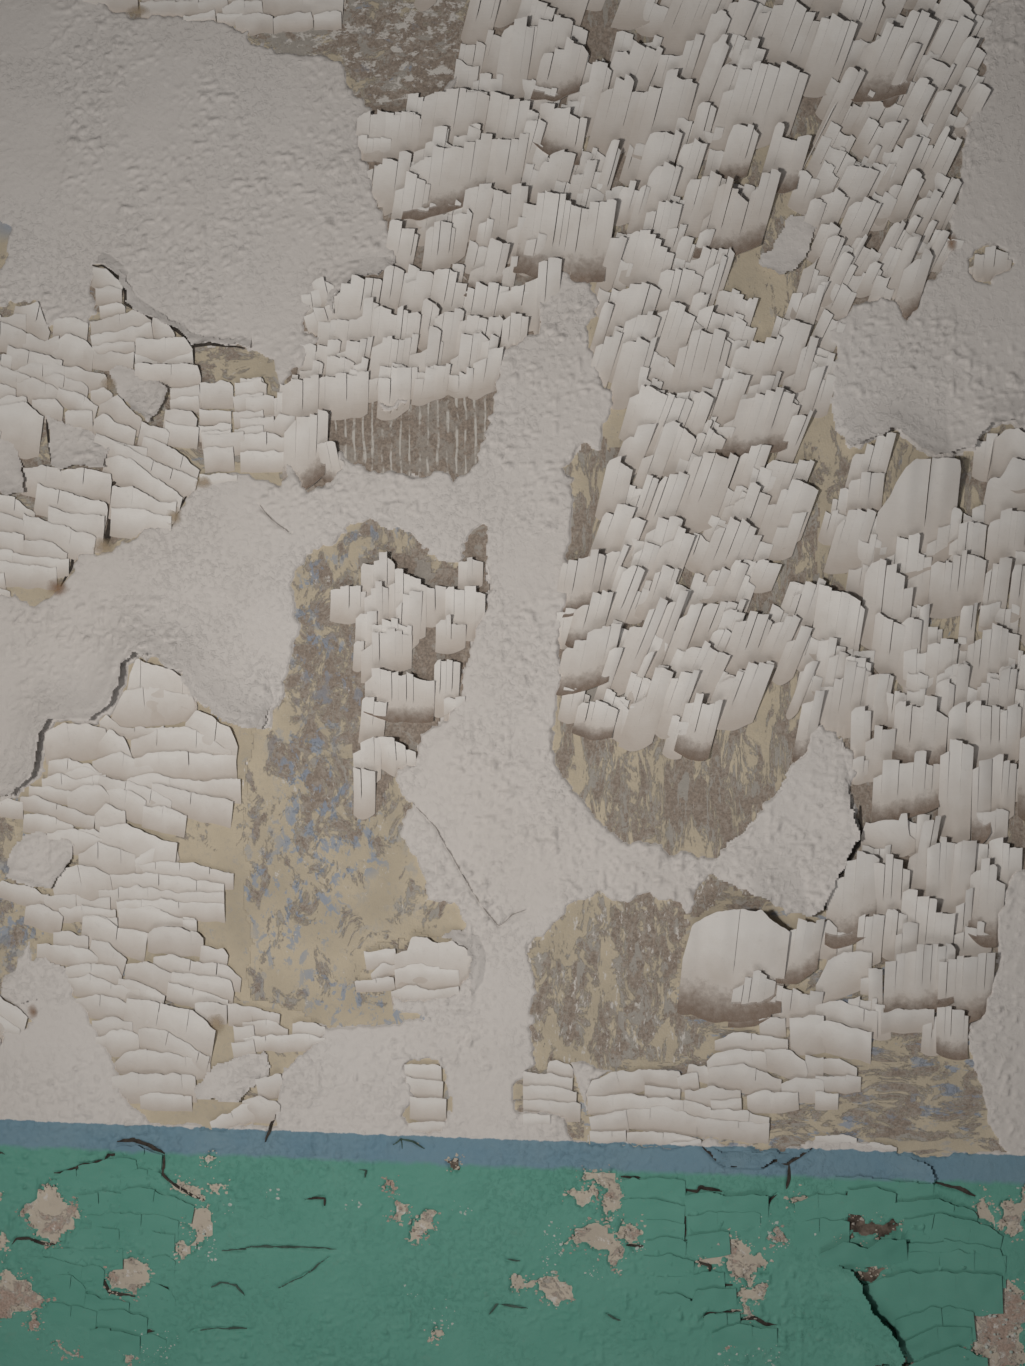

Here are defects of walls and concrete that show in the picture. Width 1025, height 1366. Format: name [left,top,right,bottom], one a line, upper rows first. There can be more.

peeling [0,0,1008,606]
peeling [509,102,1025,1366]
peeling [0,518,490,1131]
crack [12,1237,55,1246]
peeling [0,1232,84,1363]
peeling [15,1177,86,1249]
crack [54,1137,204,1201]
crack [103,1281,168,1297]
peeling [170,1150,230,1263]
crack [200,1245,334,1331]
crack [684,1147,812,1326]
crack [936,1182,976,1210]